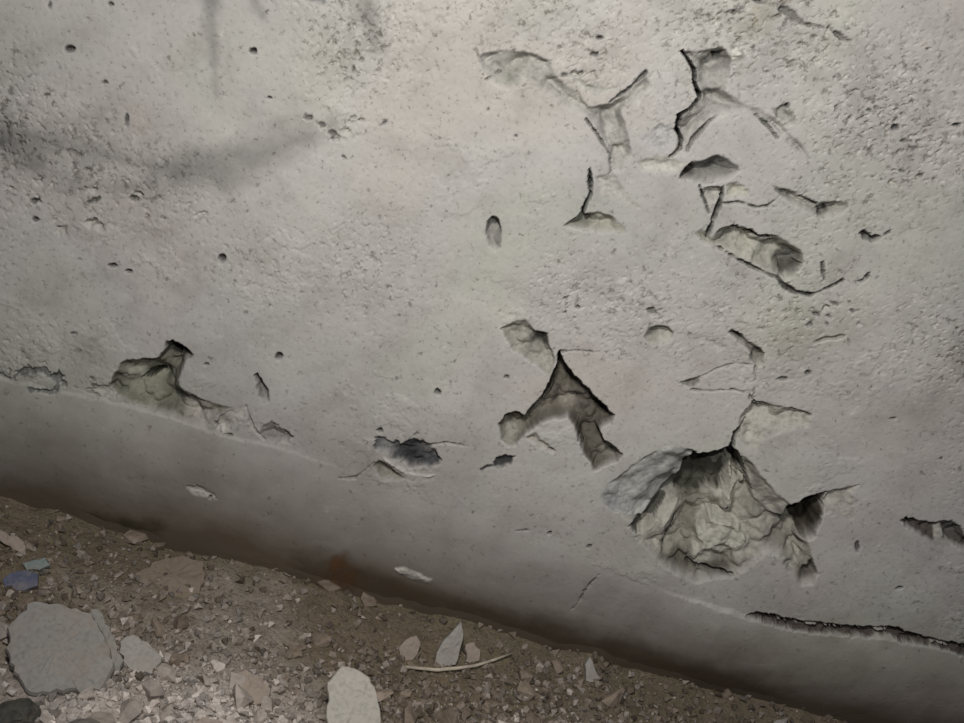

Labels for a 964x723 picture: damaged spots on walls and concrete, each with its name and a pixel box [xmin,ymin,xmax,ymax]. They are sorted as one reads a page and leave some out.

spalling [476,0,872,330]
peeling [880,116,941,198]
spalling [858,226,894,244]
spalling [84,339,295,446]
peeling [337,427,443,484]
spalling [477,318,860,588]
spalling [899,516,964,552]
crack [745,611,964,658]